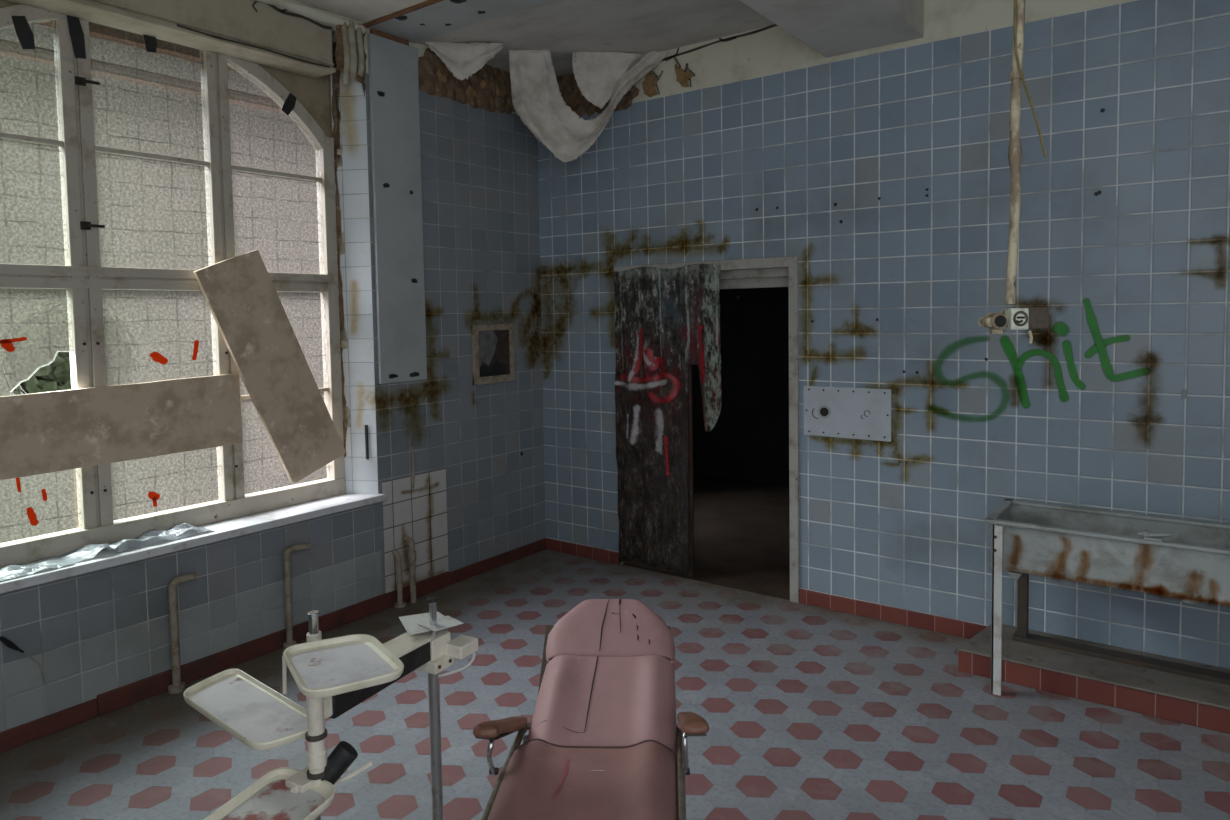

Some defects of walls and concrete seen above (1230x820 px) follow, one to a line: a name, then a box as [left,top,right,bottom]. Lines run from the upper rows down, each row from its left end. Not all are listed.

flaking render [418,48,516,115]
flaking render [556,57,695,117]